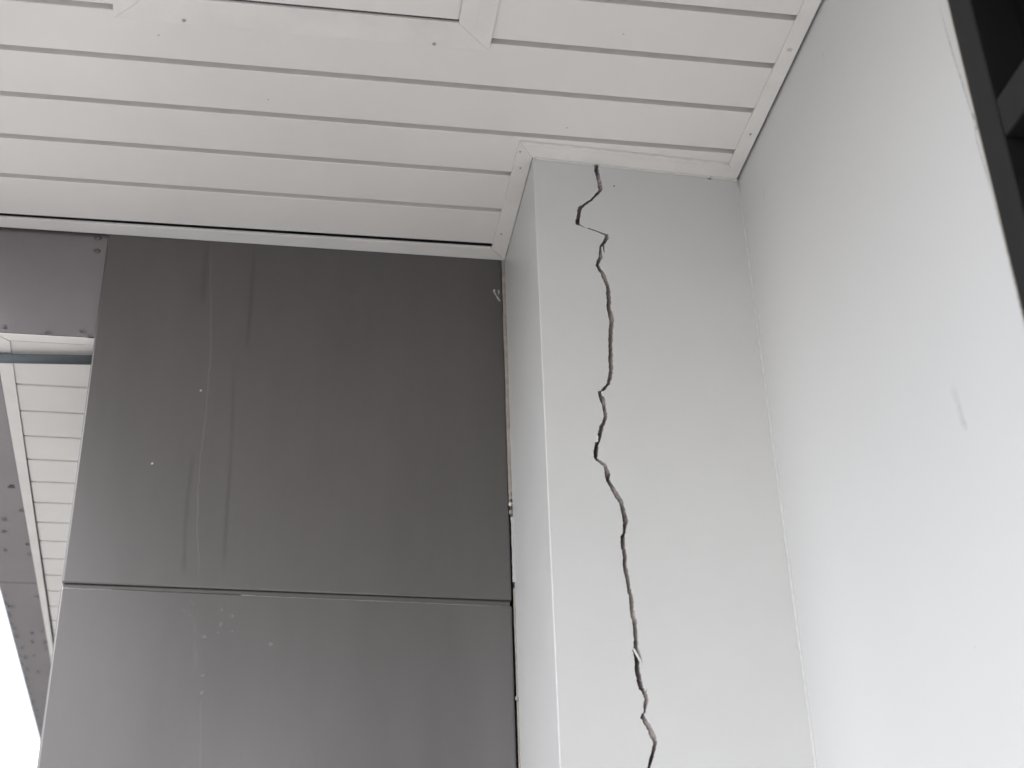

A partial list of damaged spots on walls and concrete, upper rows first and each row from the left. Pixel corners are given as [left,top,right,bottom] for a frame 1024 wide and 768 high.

crack [575,165,657,768]